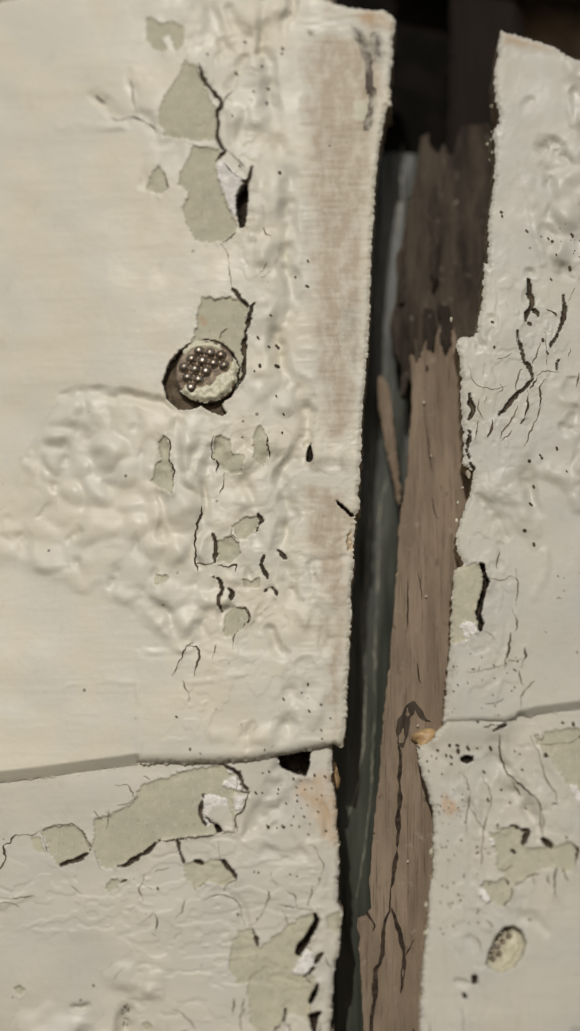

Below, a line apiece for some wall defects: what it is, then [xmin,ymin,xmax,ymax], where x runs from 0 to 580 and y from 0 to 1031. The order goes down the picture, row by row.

peeling [146,17,249,243]
peeling [163,297,248,416]
crack [467,279,579,470]
crack [406,573,422,635]
peeling [450,563,489,644]
spalling [278,751,311,776]
crack [0,766,324,1031]
peeling [92,762,245,892]
crack [365,746,415,1031]
peeling [478,825,576,908]
peeling [228,912,342,1031]
crack [305,953,331,984]